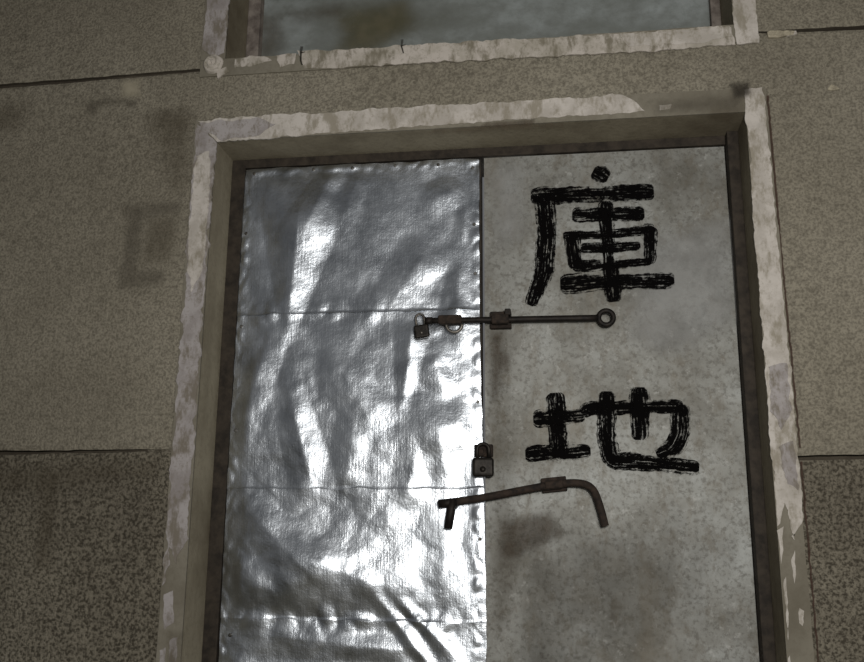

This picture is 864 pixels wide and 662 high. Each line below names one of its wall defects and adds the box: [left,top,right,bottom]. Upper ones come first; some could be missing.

peeling [744,87,804,637]